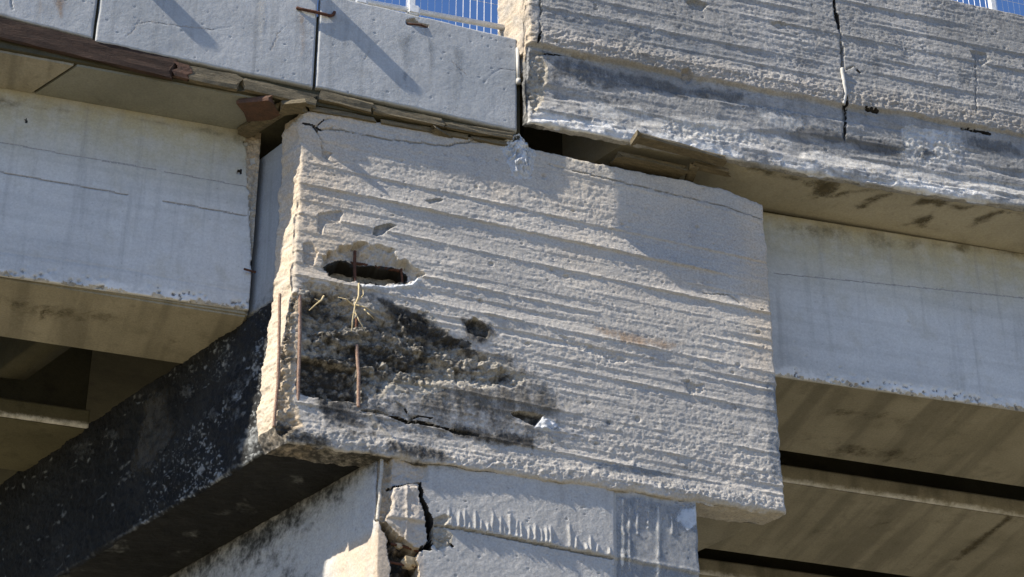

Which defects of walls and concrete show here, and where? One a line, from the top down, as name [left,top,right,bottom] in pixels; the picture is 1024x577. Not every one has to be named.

crack [832,0,840,30]
crack [840,67,879,140]
crack [302,119,474,147]
leakage [913,200,1002,226]
spalling [272,209,527,440]
leakage [129,389,175,477]
crack [388,408,457,434]
spalling [511,410,545,426]
crack [386,482,614,560]